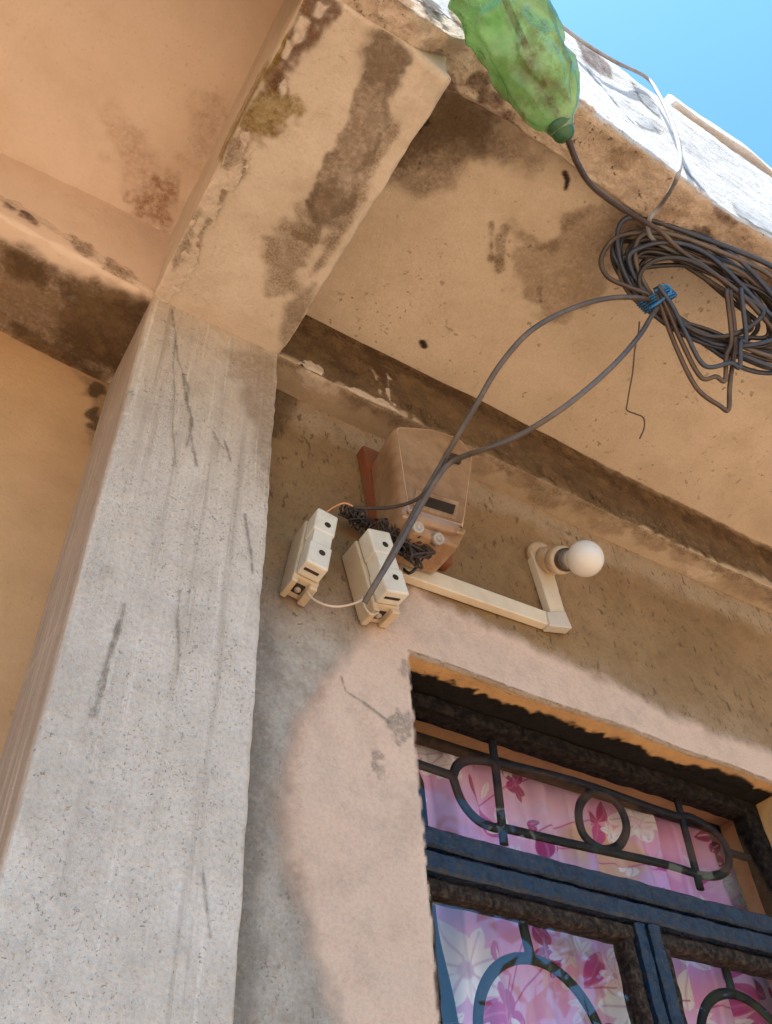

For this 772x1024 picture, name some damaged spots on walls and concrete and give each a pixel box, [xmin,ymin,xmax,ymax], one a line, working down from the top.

water stain [219,0,341,158]
peeling [0,131,253,303]
water stain [0,241,149,382]
water stain [265,31,772,593]